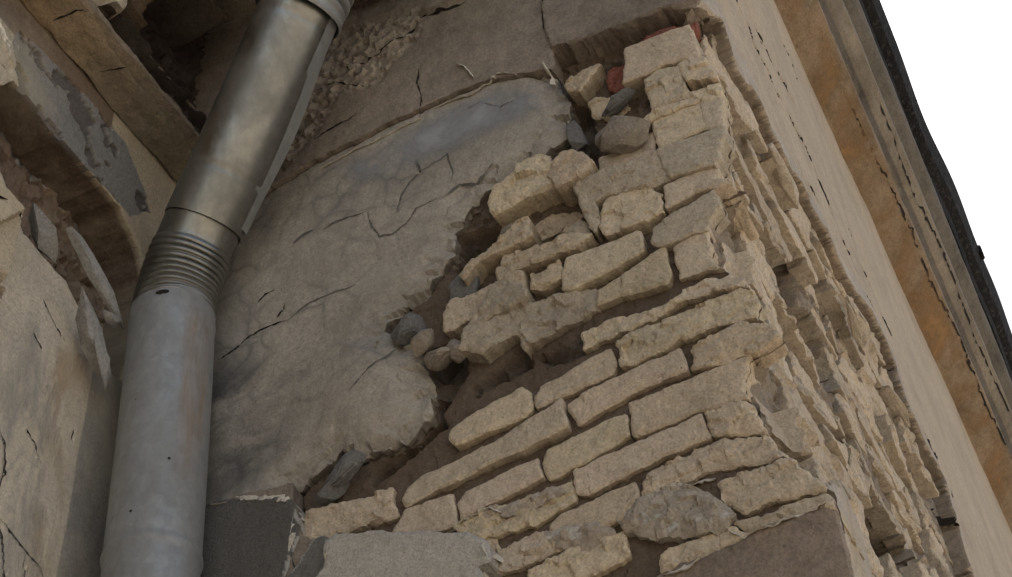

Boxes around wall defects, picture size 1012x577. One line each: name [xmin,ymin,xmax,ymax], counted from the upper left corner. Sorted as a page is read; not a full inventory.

crack [317,1,465,90]
crack [315,115,354,139]
crack [415,67,423,117]
crack [293,153,492,244]
spalling [0,131,123,390]
crack [218,285,354,360]
spalling [206,9,955,577]
crack [349,344,406,390]
crack [0,428,43,486]
crack [0,520,43,577]